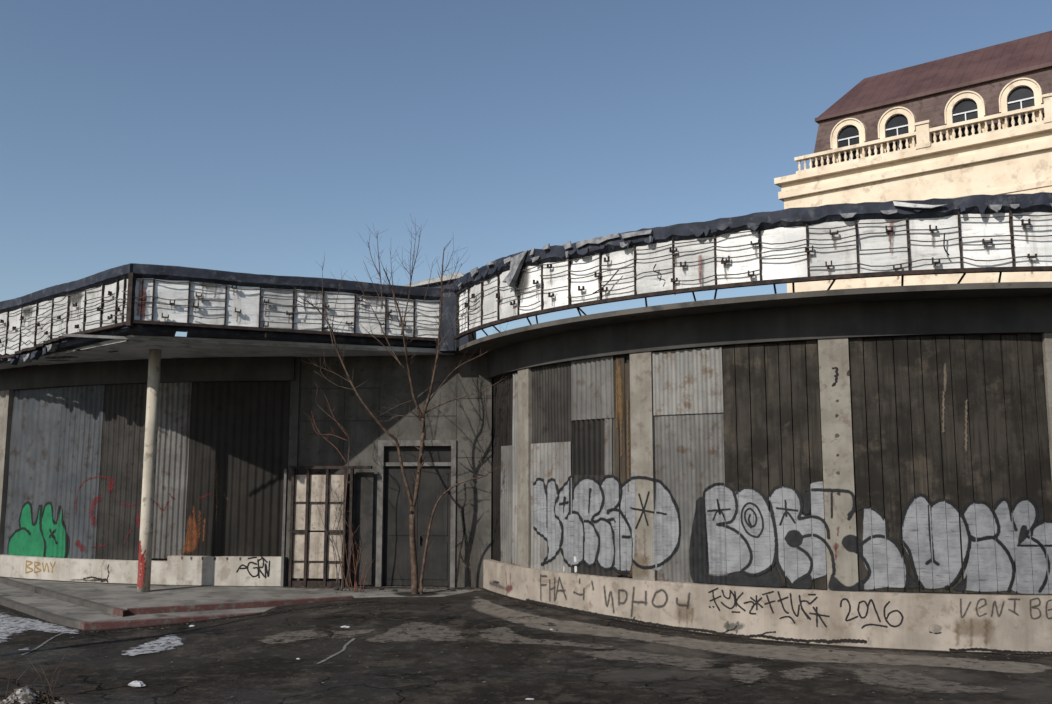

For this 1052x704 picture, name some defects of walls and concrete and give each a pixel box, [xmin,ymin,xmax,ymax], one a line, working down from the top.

peeling [881,201,1019,215]
peeling [563,229,654,258]
peeling [458,243,550,290]
rust [137,280,146,319]